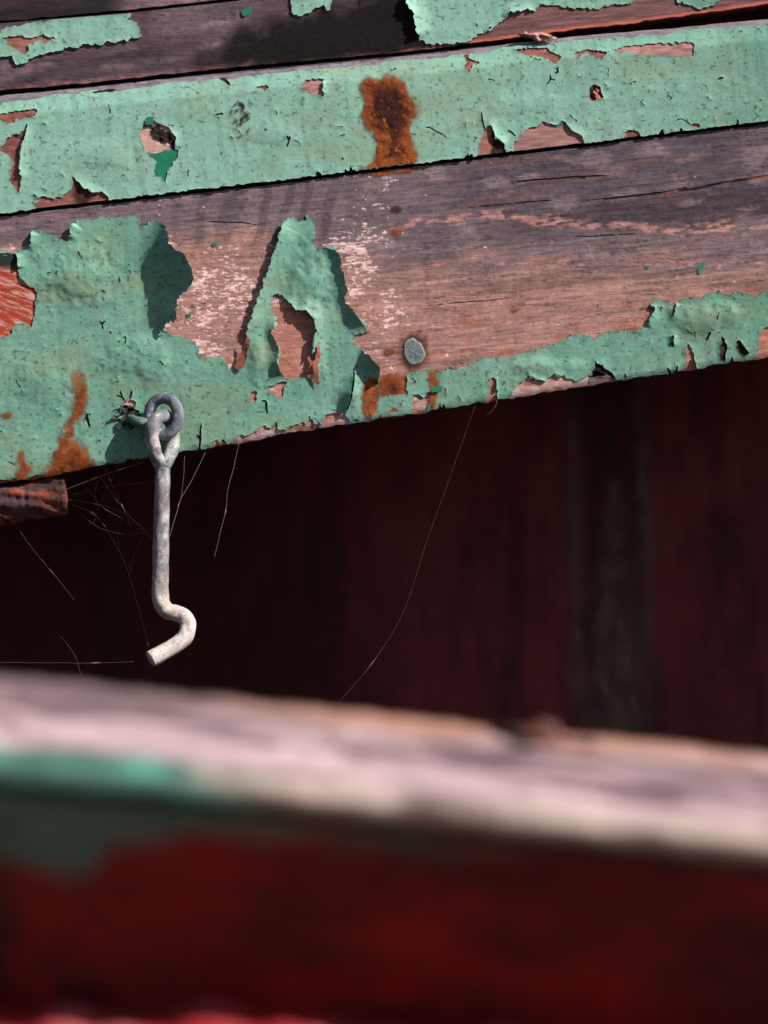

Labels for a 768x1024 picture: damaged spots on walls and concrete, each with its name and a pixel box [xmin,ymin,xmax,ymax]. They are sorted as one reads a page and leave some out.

peeling [3,34,55,53]
peeling [396,0,434,51]
peeling [462,0,768,72]
peeling [301,78,324,97]
corrosion [360,73,418,176]
hole [589,85,603,101]
peeling [0,109,768,448]
corrosion [362,334,443,419]
peeling [0,474,60,483]
corrosion [0,374,95,526]